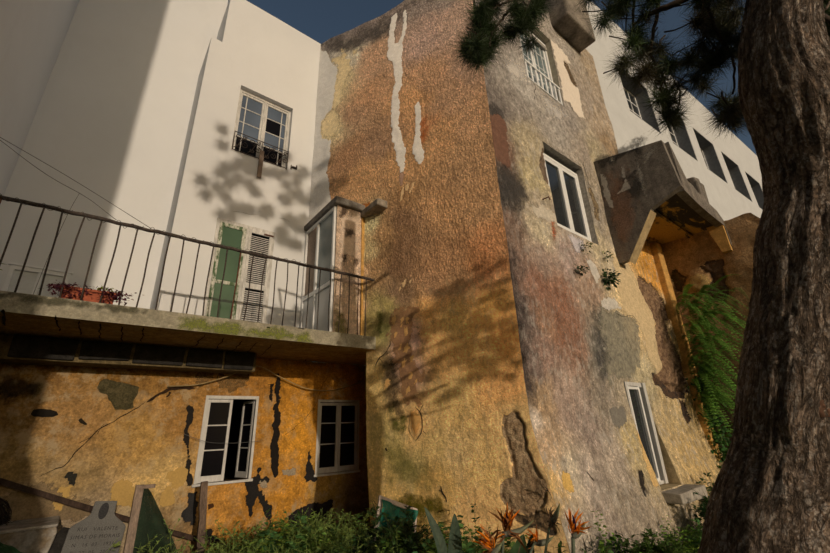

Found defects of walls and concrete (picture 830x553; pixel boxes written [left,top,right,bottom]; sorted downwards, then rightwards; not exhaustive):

peeling [321,48,357,138]
peeling [550,39,586,119]
peeling [587,259,600,283]
peeling [383,305,425,407]
flaking render [601,252,691,424]
crack [39,402,145,477]
flaking render [500,411,556,536]
peeling [635,425,659,487]